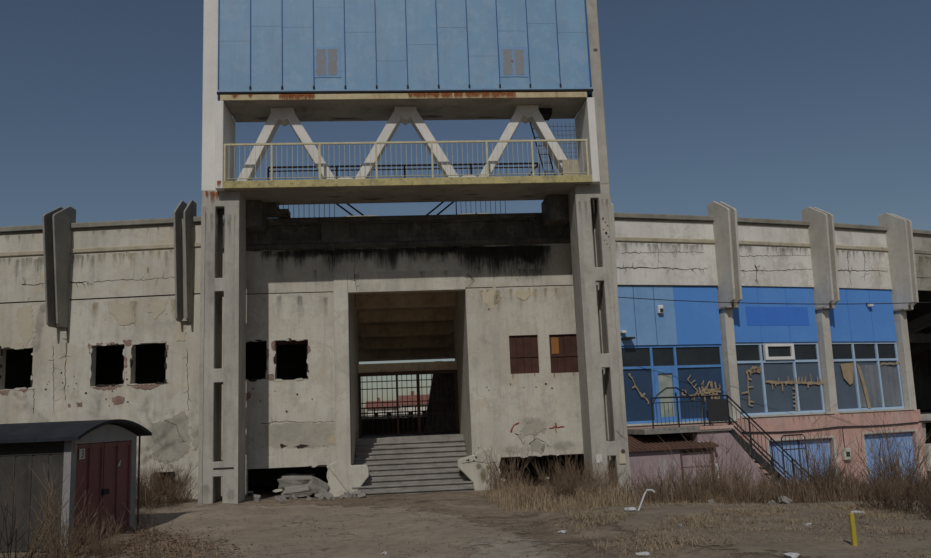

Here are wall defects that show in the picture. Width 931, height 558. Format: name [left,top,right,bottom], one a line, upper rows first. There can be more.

crack [70,270,171,288]
water stain [262,244,550,275]
spalling [0,346,50,395]
crack [30,329,68,413]
flaking render [68,321,187,407]